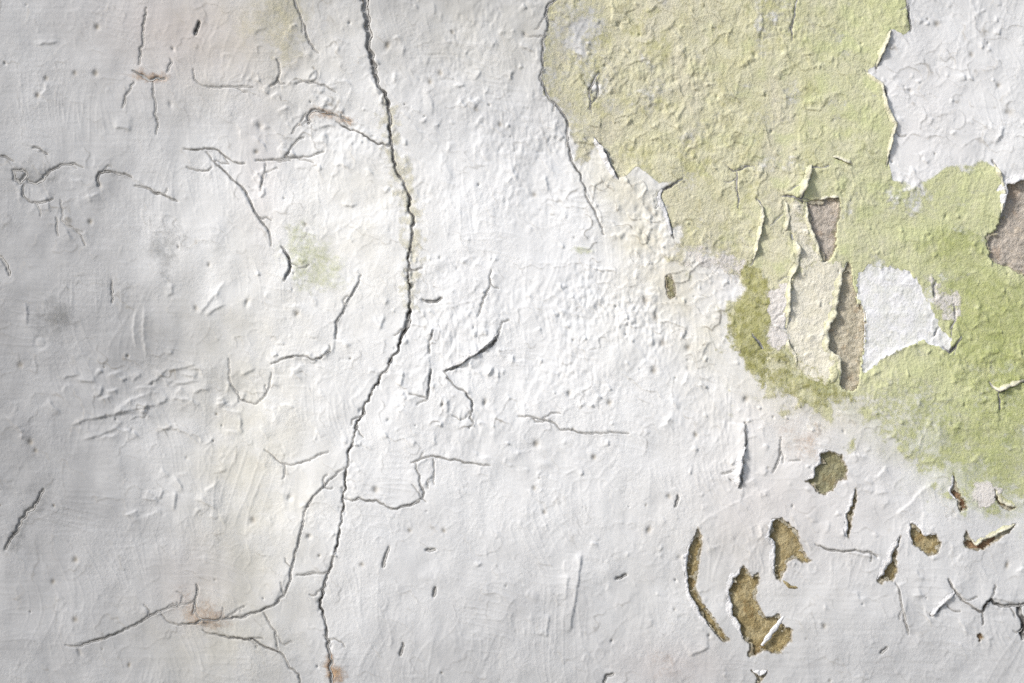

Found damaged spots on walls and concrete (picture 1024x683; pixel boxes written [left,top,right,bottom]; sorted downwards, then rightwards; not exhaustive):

crack [22,163,178,244]
peeling [542,0,1024,551]
crack [66,0,508,683]
crack [518,413,629,434]
peeling [680,529,792,657]
peeling [764,518,810,589]
peeling [877,521,941,584]
crack [896,580,1024,639]